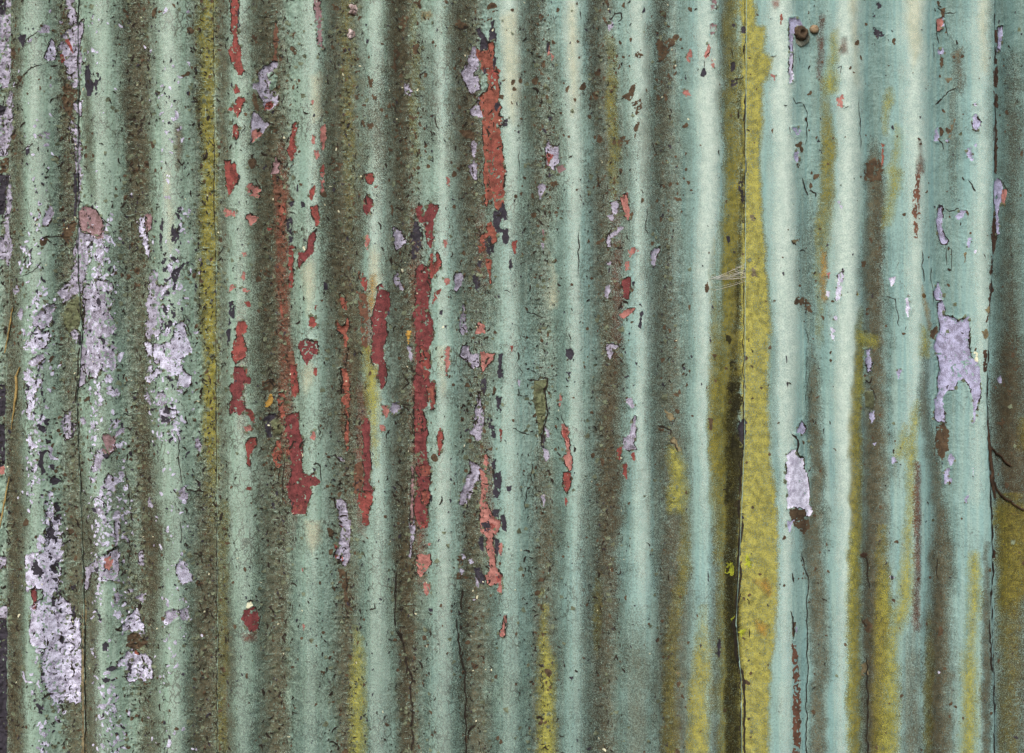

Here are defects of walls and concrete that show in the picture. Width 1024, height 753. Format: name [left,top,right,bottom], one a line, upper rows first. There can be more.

corrosion [476,42,506,284]
peeling [0,0,376,753]
corrosion [241,607,260,640]
corrosion [224,122,327,515]
corrosion [337,271,390,531]
corrosion [406,203,450,596]
corrosion [479,448,503,593]
peeling [783,421,814,532]
peeling [932,283,989,424]